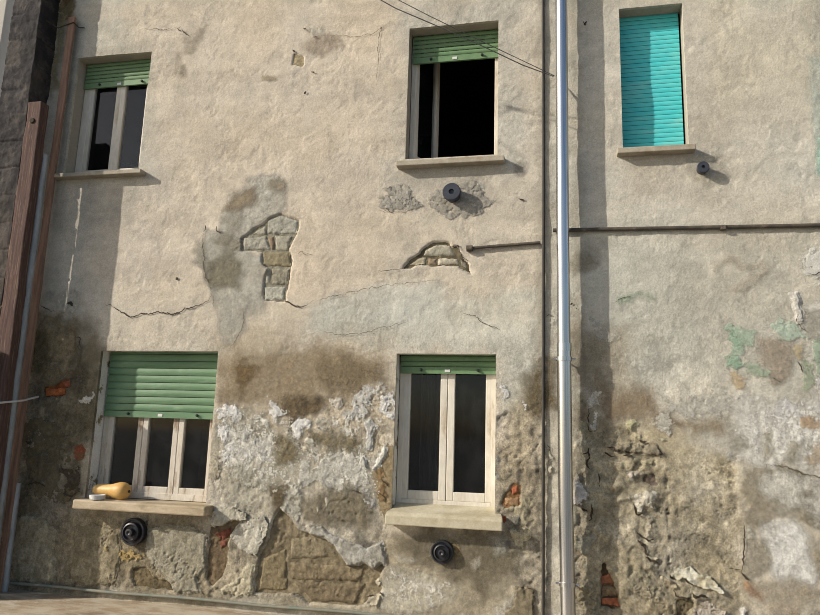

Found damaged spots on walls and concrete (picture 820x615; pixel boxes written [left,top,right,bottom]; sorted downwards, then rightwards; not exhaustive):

rust [50,0,74,86]
crack [108,225,221,318]
flaking render [242,214,299,302]
flaking render [378,242,470,273]
peeling [798,247,820,286]
water stain [31,306,86,391]
peeling [770,291,820,393]
water stain [211,350,387,530]
flaking render [207,381,395,609]
flaking render [605,419,670,538]
peeling [800,415,820,431]
flaking render [577,557,726,615]